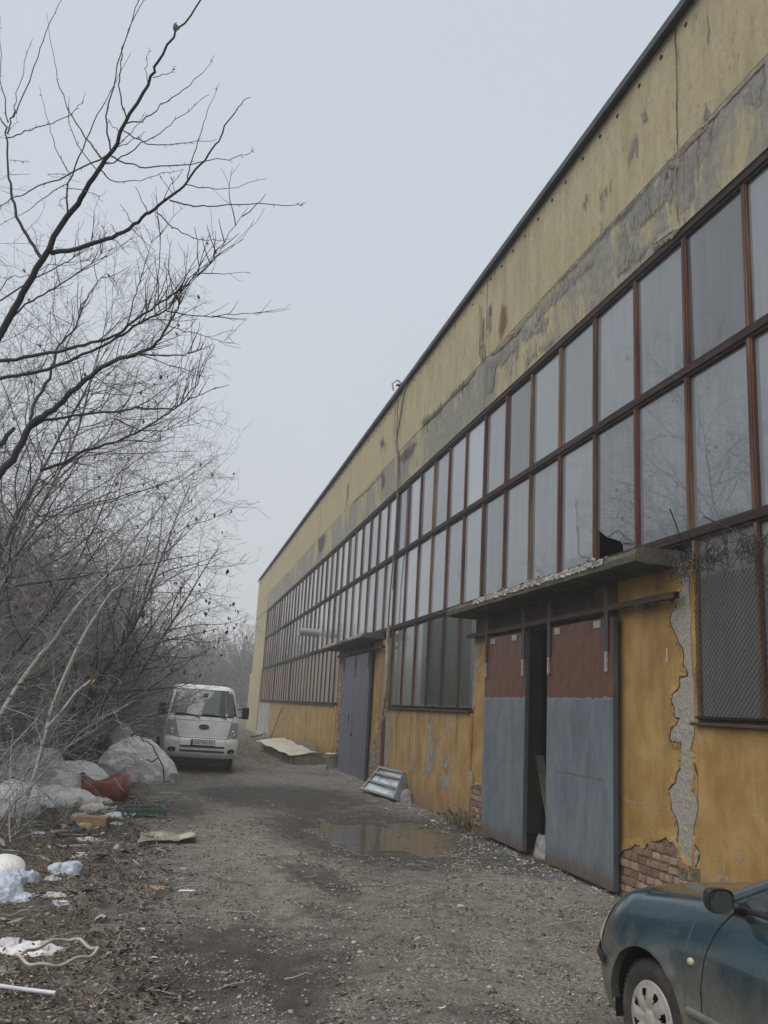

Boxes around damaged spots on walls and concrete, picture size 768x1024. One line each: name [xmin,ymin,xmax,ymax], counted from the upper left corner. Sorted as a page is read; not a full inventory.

flaking render [668,102,709,171]
crack [521,28,765,326]
spalling [652,226,680,252]
peeling [480,306,553,364]
peeling [410,712,451,790]
peeling [618,563,700,897]